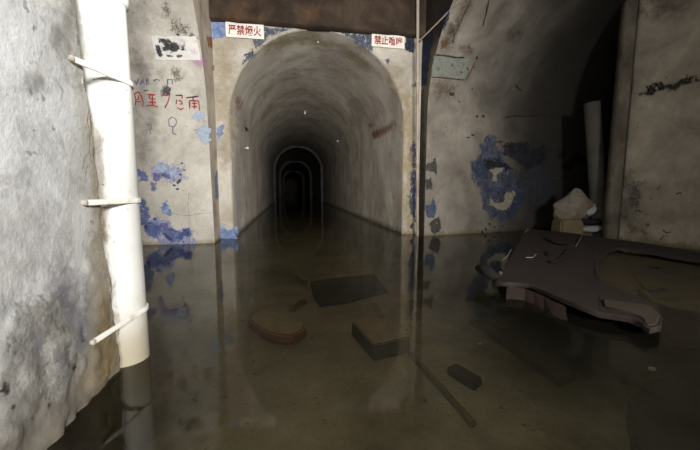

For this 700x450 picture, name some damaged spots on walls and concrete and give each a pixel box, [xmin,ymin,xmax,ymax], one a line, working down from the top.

peeling [208,22,226,45]
peeling [242,27,291,64]
peeling [342,33,373,52]
peeling [191,112,224,145]
peeling [137,160,186,191]
peeling [425,158,441,233]
peeling [469,135,559,233]
peeling [140,197,196,246]
peeling [220,223,239,241]